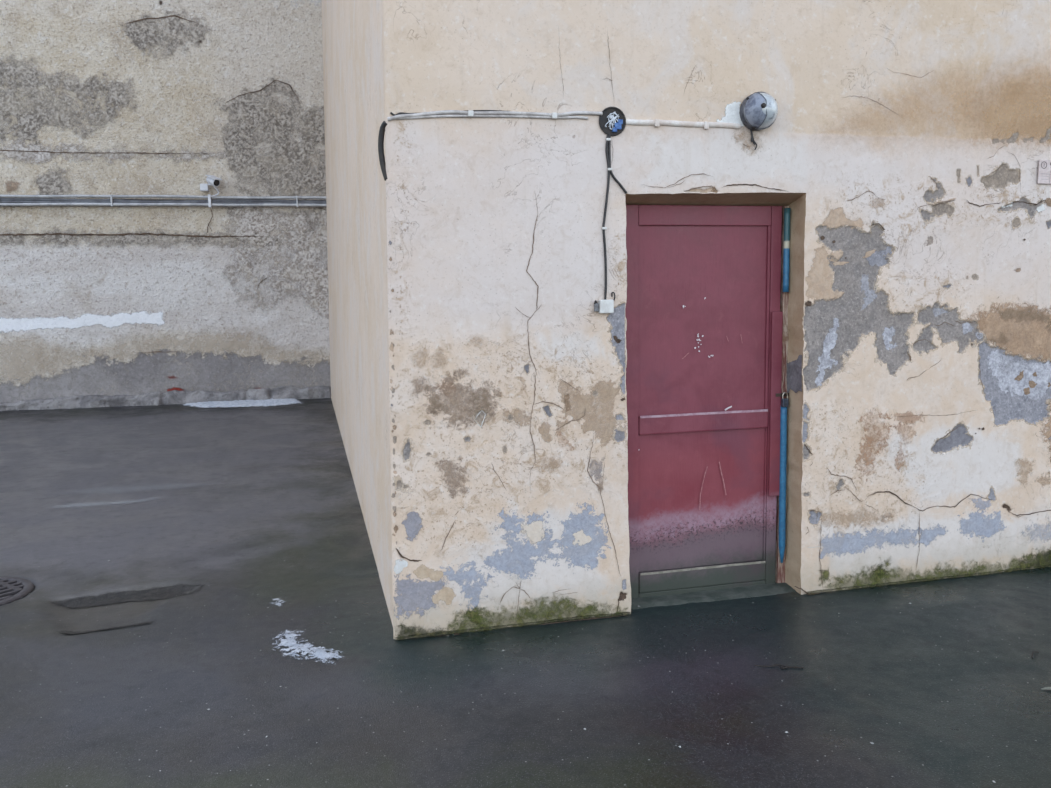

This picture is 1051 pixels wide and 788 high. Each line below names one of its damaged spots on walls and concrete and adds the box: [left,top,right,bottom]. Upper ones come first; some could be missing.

crack [646,173,785,191]
flaking render [919,176,955,246]
flaking render [957,162,1051,229]
crack [515,194,563,475]
flaking render [606,302,626,401]
flaking render [787,207,1051,466]
crack [537,433,623,626]
peeling [572,529,592,546]
flaking render [804,492,821,535]
crack [794,468,1051,595]
peeling [413,560,492,611]
crack [500,582,578,610]